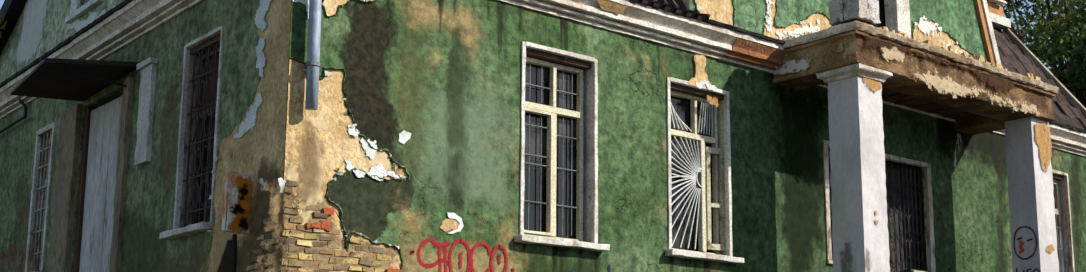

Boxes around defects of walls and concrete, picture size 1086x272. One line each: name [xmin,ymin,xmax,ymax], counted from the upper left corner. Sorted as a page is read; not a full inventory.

flaking render [199,0,511,272]
damp [301,0,414,249]
flaking render [688,55,717,91]